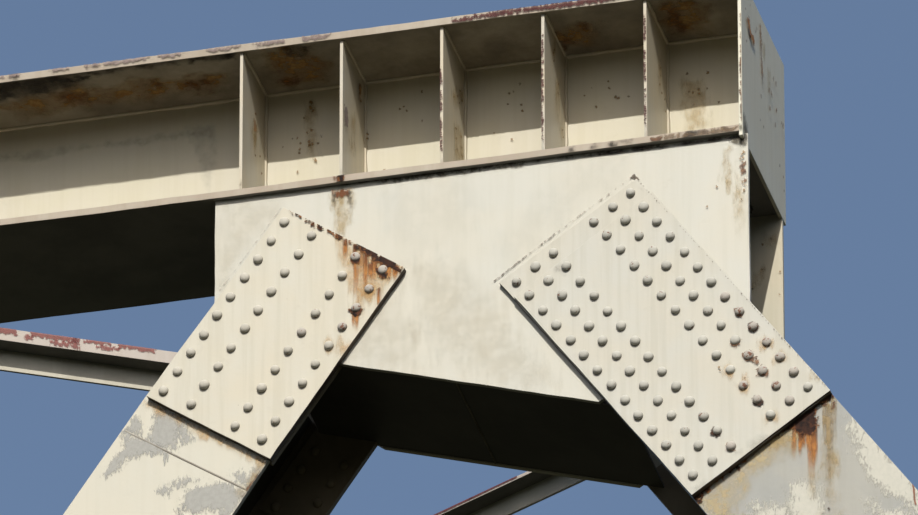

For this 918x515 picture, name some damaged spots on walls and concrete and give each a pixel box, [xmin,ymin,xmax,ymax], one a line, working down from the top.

corrosion [739,13,763,133]
corrosion [290,211,403,304]
peeling [103,408,196,479]
peeling [156,465,262,515]
corrosion [694,459,747,504]
peeling [745,479,826,515]
corrosion [772,394,835,460]
peeling [843,415,918,515]